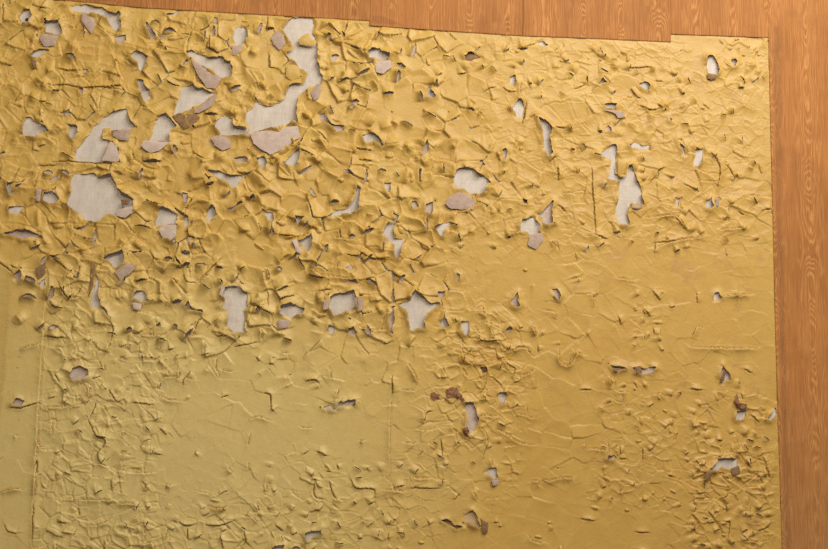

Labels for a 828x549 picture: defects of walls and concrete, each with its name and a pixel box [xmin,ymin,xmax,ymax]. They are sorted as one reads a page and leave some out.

peeling [72,4,159,104]
peeling [36,26,248,222]
peeling [203,17,325,221]
peeling [408,162,494,240]
peeling [516,196,557,249]
peeling [595,139,655,229]
peeling [216,284,252,336]
peeling [323,265,364,338]
peeling [379,208,472,337]
crack [303,364,459,512]
crack [737,438,770,500]
crack [685,505,767,540]